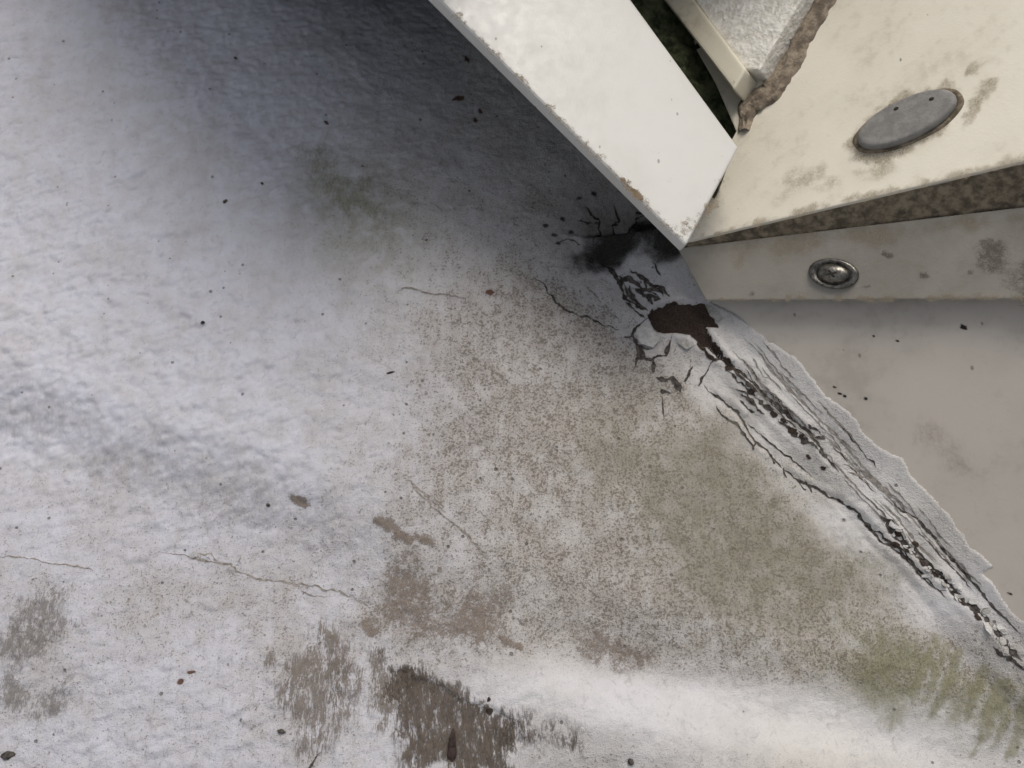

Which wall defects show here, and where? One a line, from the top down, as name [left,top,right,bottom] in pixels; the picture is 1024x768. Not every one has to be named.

peeling [635,301,740,374]
crack [531,263,1021,635]
crack [2,555,92,570]
crack [168,552,364,604]
peeling [880,515,1024,670]
water stain [0,672,66,719]
water stain [318,621,349,699]
water stain [369,650,394,730]